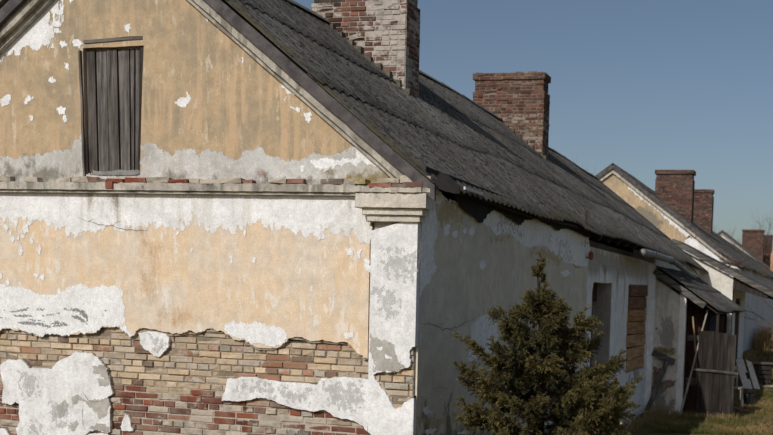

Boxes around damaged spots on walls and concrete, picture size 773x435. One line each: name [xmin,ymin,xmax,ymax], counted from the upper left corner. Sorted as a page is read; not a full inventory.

peeling [0,0,82,62]
peeling [0,135,388,185]
peeling [0,192,400,273]
peeling [419,189,590,298]
spalling [0,274,416,435]